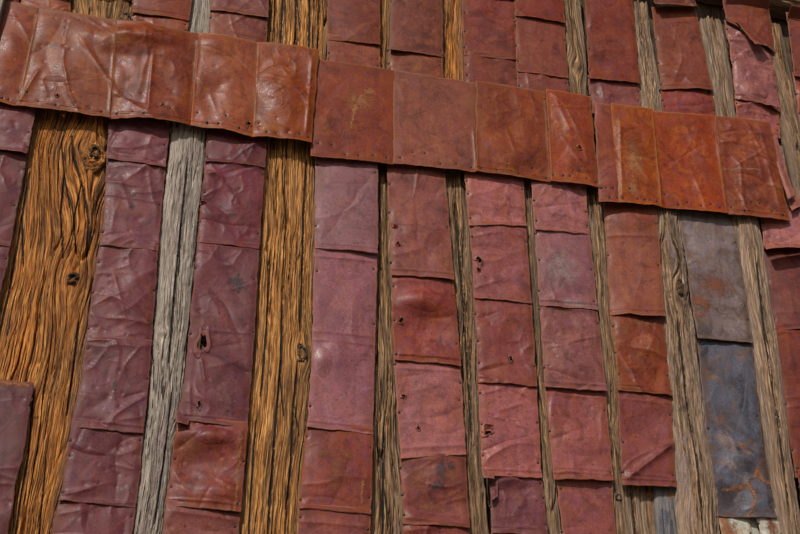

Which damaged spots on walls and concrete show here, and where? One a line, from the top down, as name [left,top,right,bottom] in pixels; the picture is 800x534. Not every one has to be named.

rust [720,466,771,517]